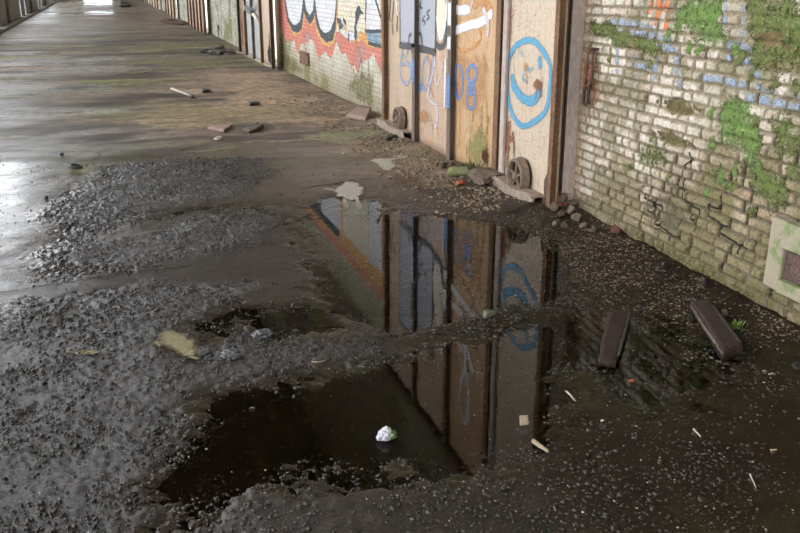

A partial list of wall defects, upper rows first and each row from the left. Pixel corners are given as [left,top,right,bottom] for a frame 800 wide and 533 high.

crack [642,152,749,255]